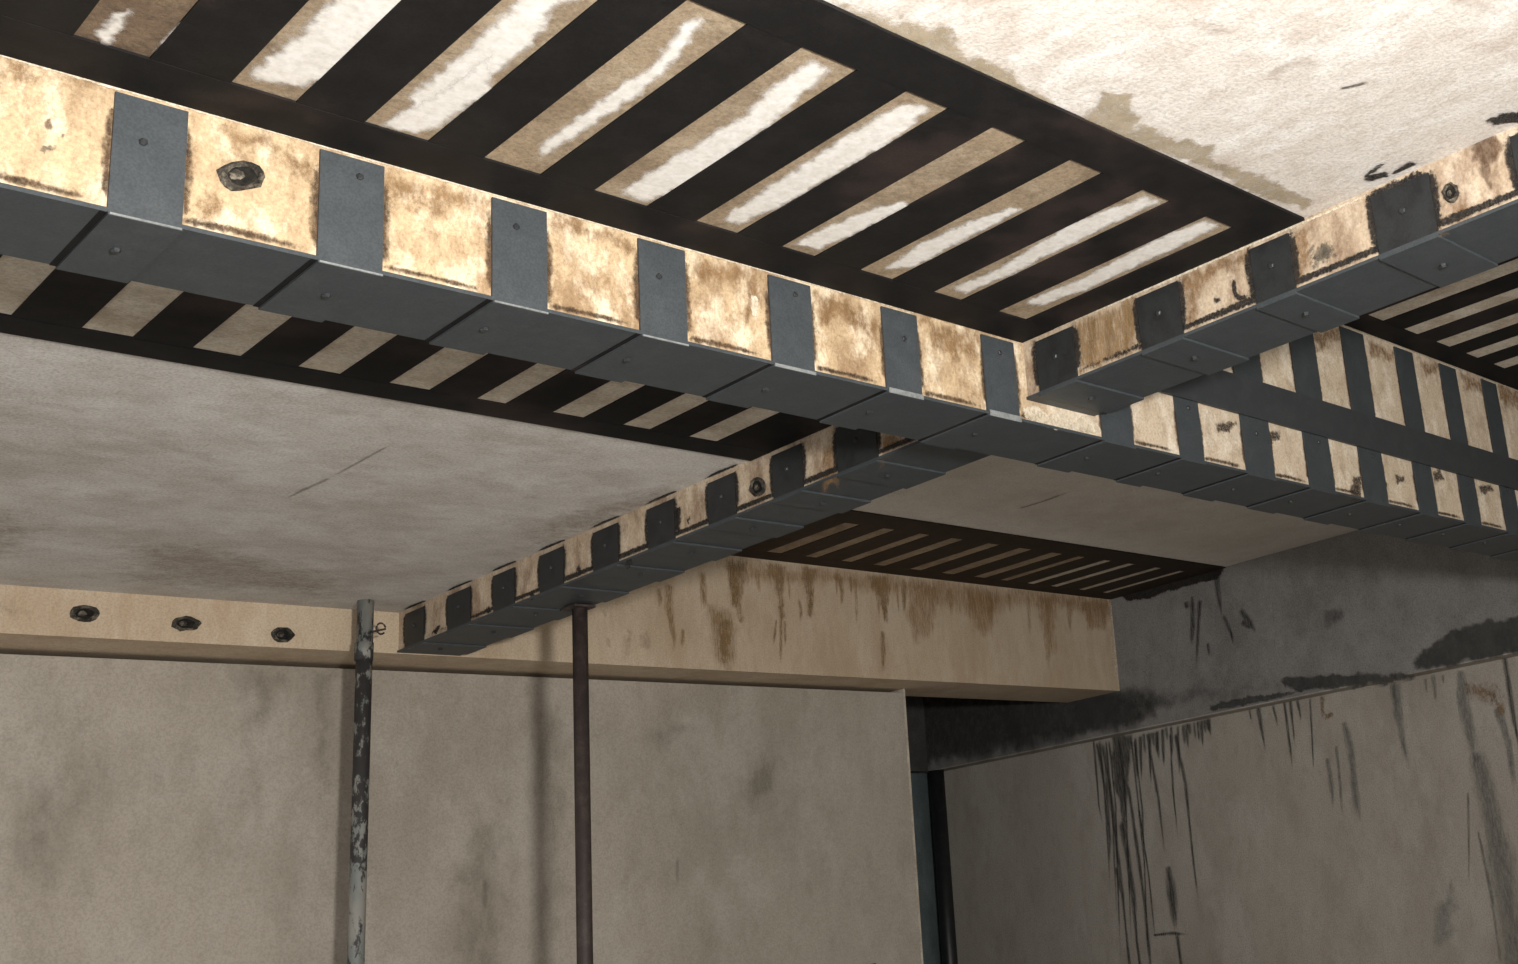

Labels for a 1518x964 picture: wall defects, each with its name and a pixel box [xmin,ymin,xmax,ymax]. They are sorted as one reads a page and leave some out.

water stain [841,4,1052,104]
water stain [1085,92,1311,210]
corrosion [701,562,744,664]
corrosion [768,564,816,651]
corrosion [869,576,906,664]
water stain [923,616,1518,964]